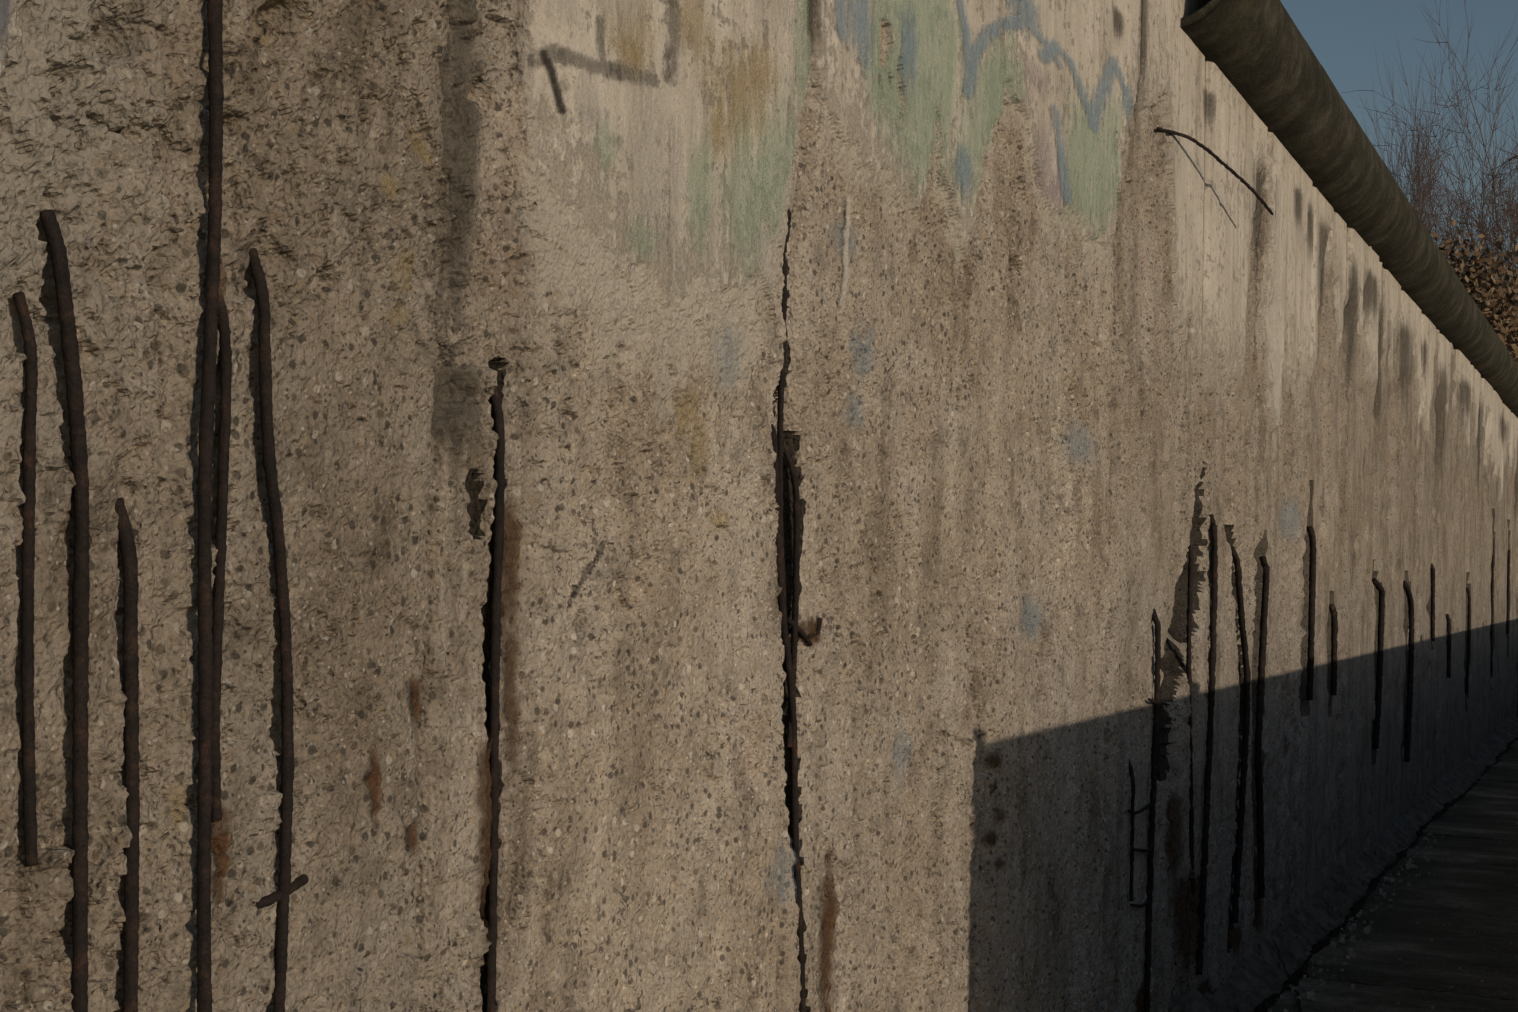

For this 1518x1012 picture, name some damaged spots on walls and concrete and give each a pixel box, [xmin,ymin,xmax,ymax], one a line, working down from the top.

spalling [0,0,209,1012]
corrosion [479,504,523,910]
spalling [211,0,802,1012]
corrosion [822,835,839,1012]
spalling [783,68,1518,1012]